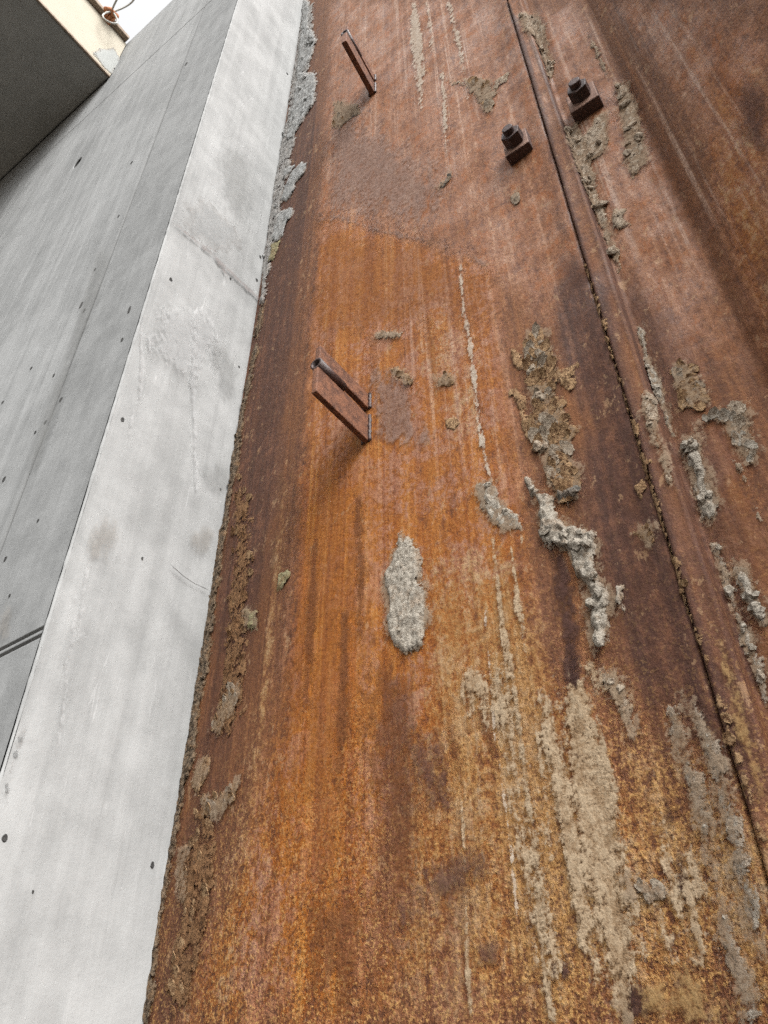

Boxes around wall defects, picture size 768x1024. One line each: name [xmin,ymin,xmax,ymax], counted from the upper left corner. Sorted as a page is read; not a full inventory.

rust [446,72,509,112]
rust [508,322,584,504]
rust [583,264,711,669]
rust [211,473,254,738]
rust [554,552,580,690]
rust [716,694,754,804]
rust [164,756,240,1017]
rust [677,860,687,891]
rust [551,962,569,979]
rust [622,985,649,1022]